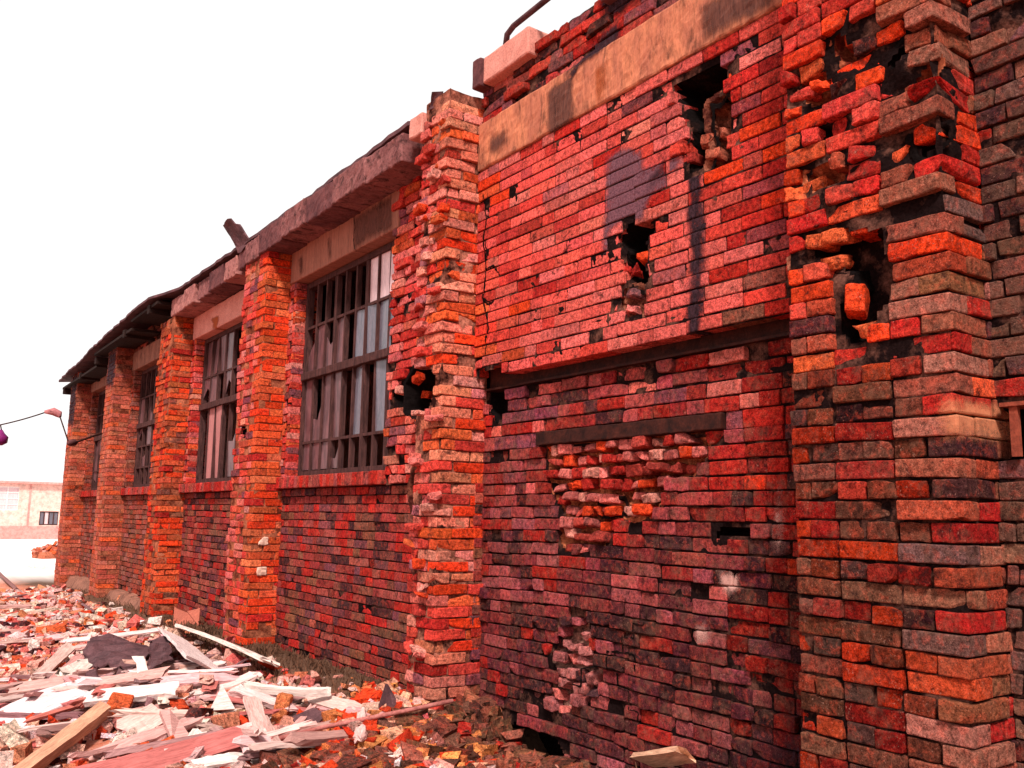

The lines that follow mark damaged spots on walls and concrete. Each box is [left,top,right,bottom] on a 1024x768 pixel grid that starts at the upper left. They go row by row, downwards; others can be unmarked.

spalling [413,143,451,262]
spalling [677,63,733,174]
spalling [790,71,832,111]
spalling [803,158,845,194]
spalling [819,122,834,139]
spalling [905,119,955,164]
crack [482,194,500,355]
spalling [618,219,656,318]
spalling [805,227,877,344]
spalling [393,365,444,422]
spalling [403,457,443,569]
spalling [403,640,427,659]